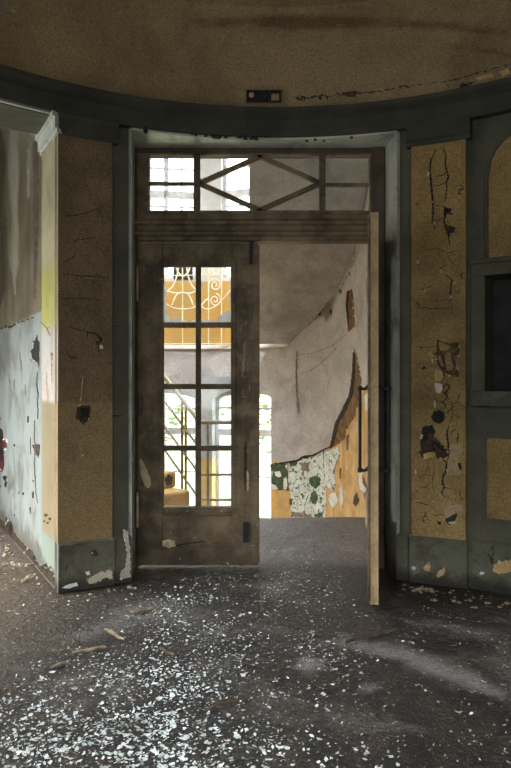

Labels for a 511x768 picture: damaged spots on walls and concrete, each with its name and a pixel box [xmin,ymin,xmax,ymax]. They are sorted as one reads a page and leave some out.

crack [415,149,465,309]
flaking render [346,289,355,332]
peeling [29,334,40,367]
crack [68,326,119,352]
peeling [421,340,460,393]
peeling [0,418,15,487]
peeling [269,349,368,523]
peeling [416,424,462,475]
peeling [0,514,131,605]
peeling [411,562,445,577]
peeling [477,552,511,577]
peeling [0,530,379,768]